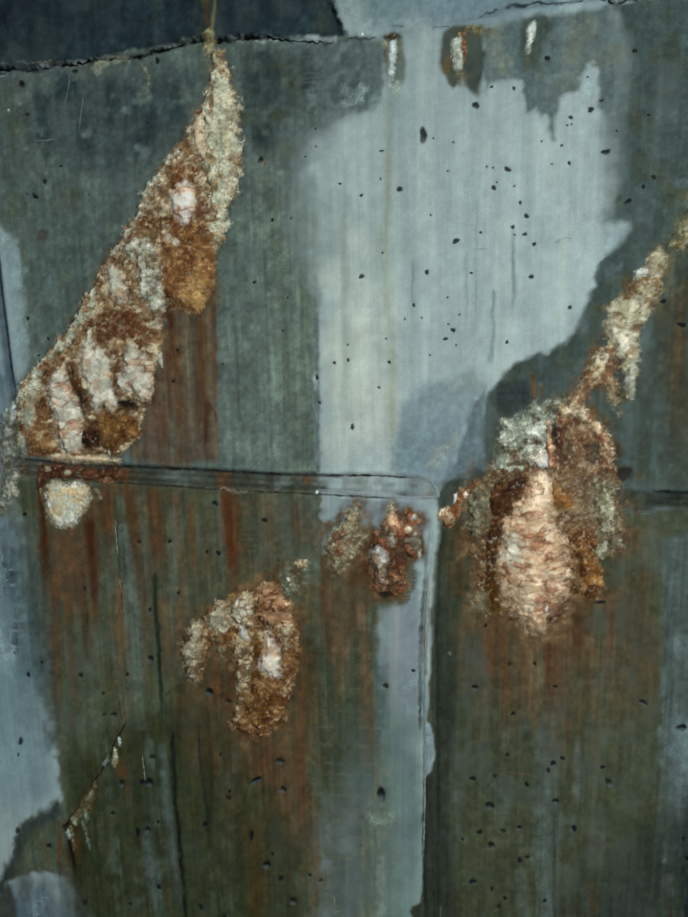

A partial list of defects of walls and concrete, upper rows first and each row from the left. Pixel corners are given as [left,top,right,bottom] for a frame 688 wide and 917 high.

crack [0,5,376,75]
crack [490,0,629,13]
corrosion [131,286,218,464]
corrosion [39,492,49,572]
corrosion [62,481,136,611]
damp [0,0,428,917]
damp [411,0,688,917]
crack [62,702,126,864]